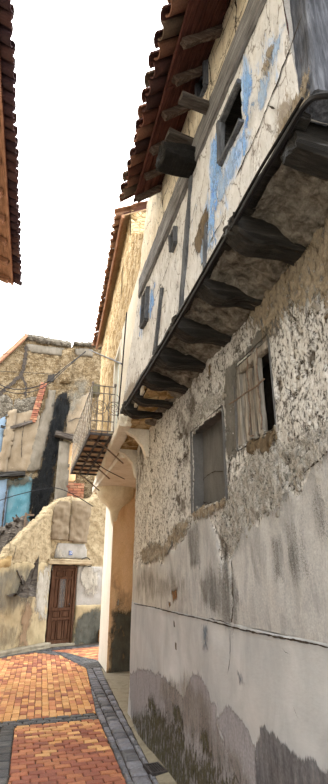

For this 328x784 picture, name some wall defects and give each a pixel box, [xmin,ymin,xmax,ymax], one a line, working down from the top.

crack [237,14,303,175]
peeling [192,35,280,264]
crack [203,450,238,513]
spalling [140,419,328,565]
peeling [18,565,51,646]
damp [74,608,101,645]
damp [107,610,131,673]
crack [134,561,328,653]
damp [201,729,211,758]